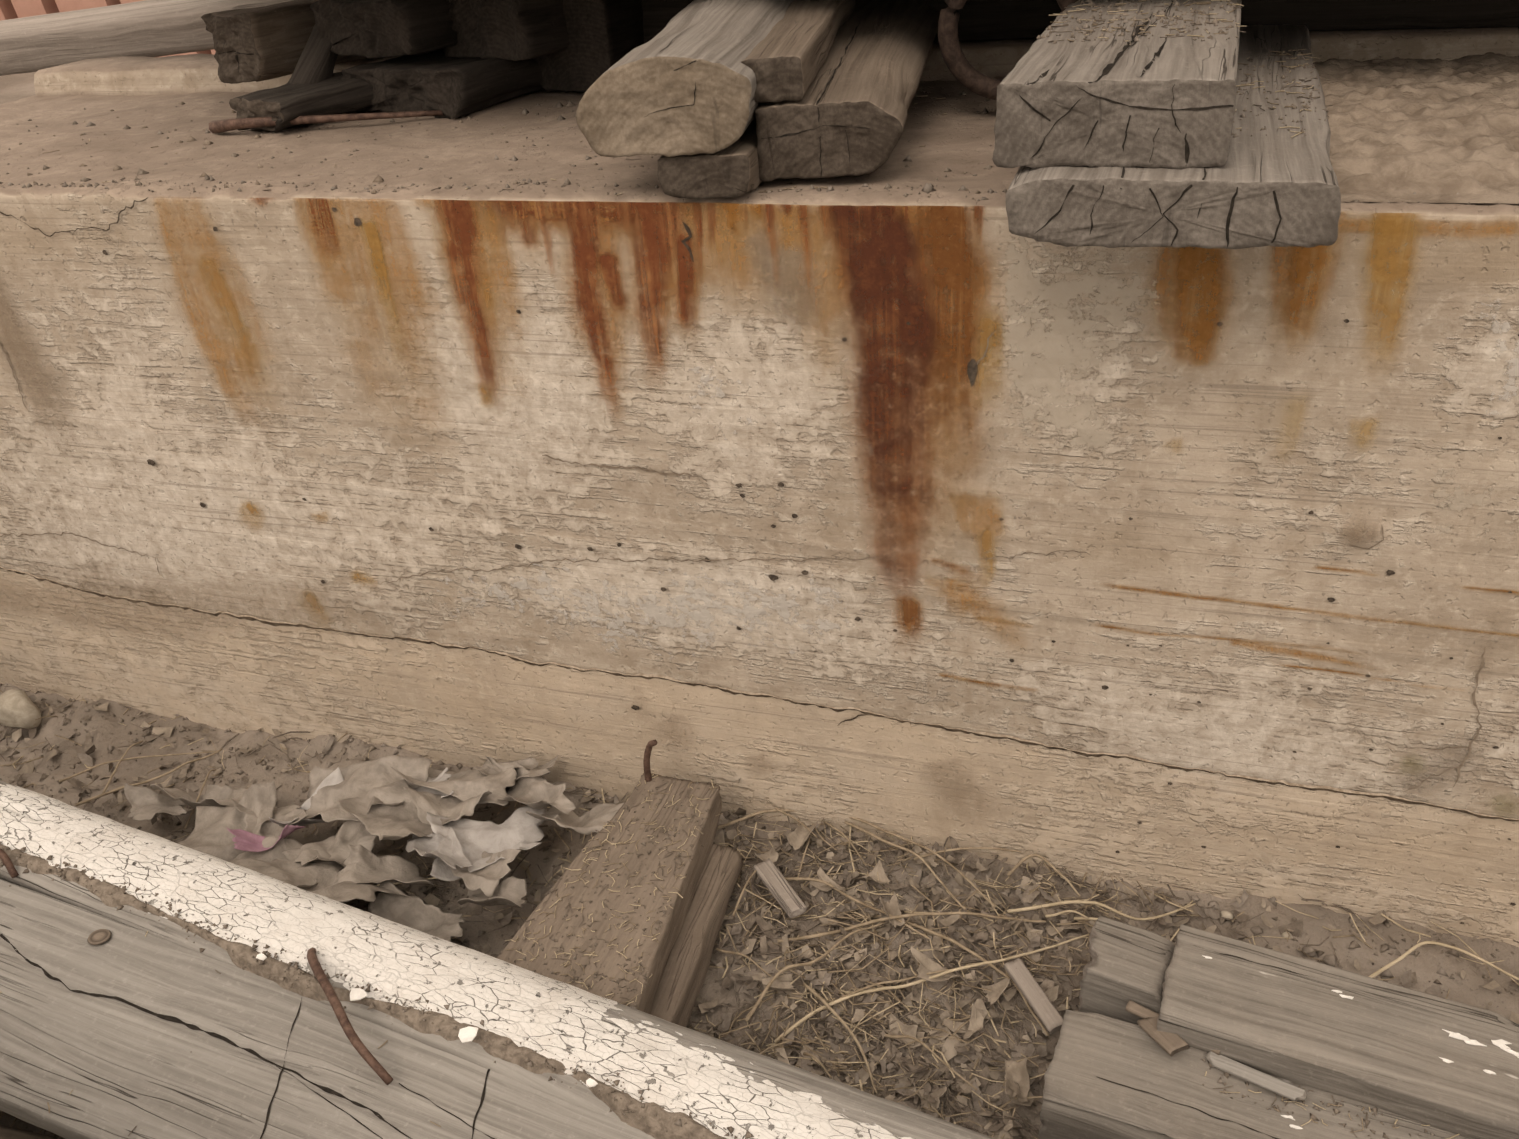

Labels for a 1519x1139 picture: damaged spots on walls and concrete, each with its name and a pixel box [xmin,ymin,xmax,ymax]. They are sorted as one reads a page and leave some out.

corrosion [157,202,246,395]
corrosion [1154,247,1231,363]
corrosion [1272,245,1336,332]
corrosion [1338,213,1519,349]
corrosion [415,199,1000,577]
crack [0,532,1519,821]
corrosion [898,597,921,633]
corrosion [1204,637,1359,675]